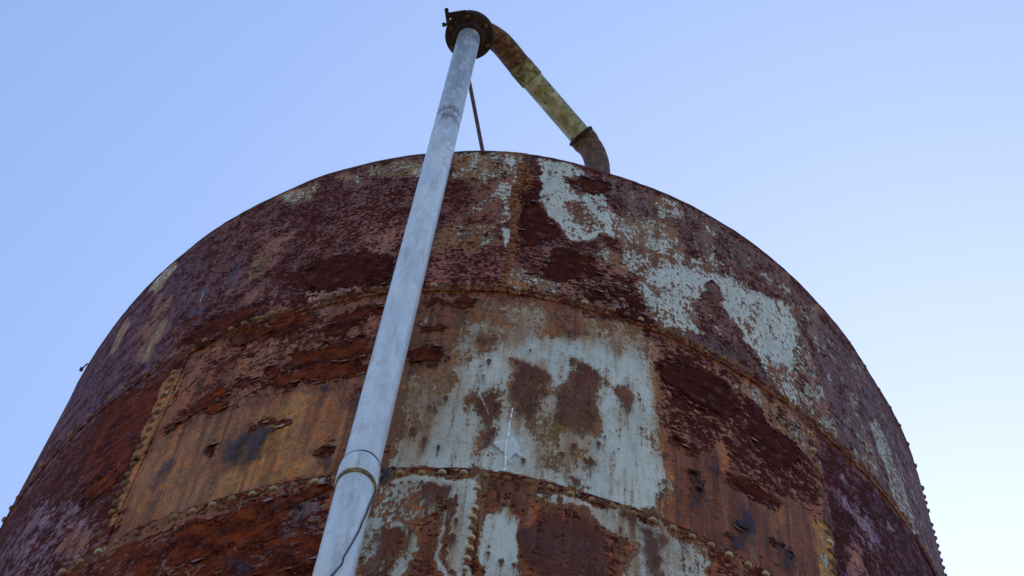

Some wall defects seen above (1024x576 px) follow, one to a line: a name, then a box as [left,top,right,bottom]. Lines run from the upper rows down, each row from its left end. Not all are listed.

peeling [516,174,658,327]
peeling [407,296,480,368]